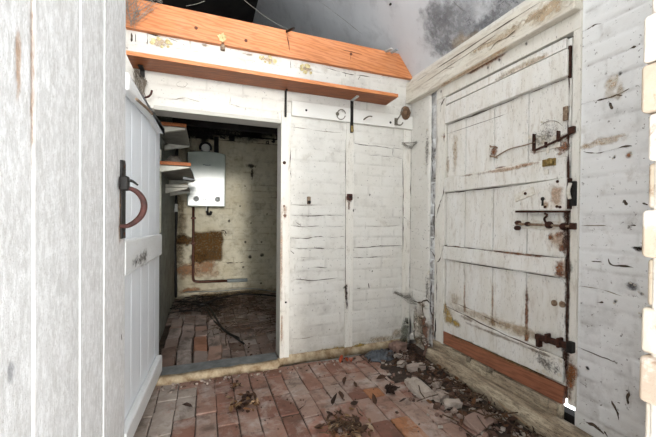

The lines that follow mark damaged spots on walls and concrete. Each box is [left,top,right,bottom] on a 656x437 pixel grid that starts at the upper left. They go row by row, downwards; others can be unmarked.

crack [419,2,540,86]
water stain [444,305,472,326]
corrosion [548,212,571,341]
corrosion [561,348,578,400]